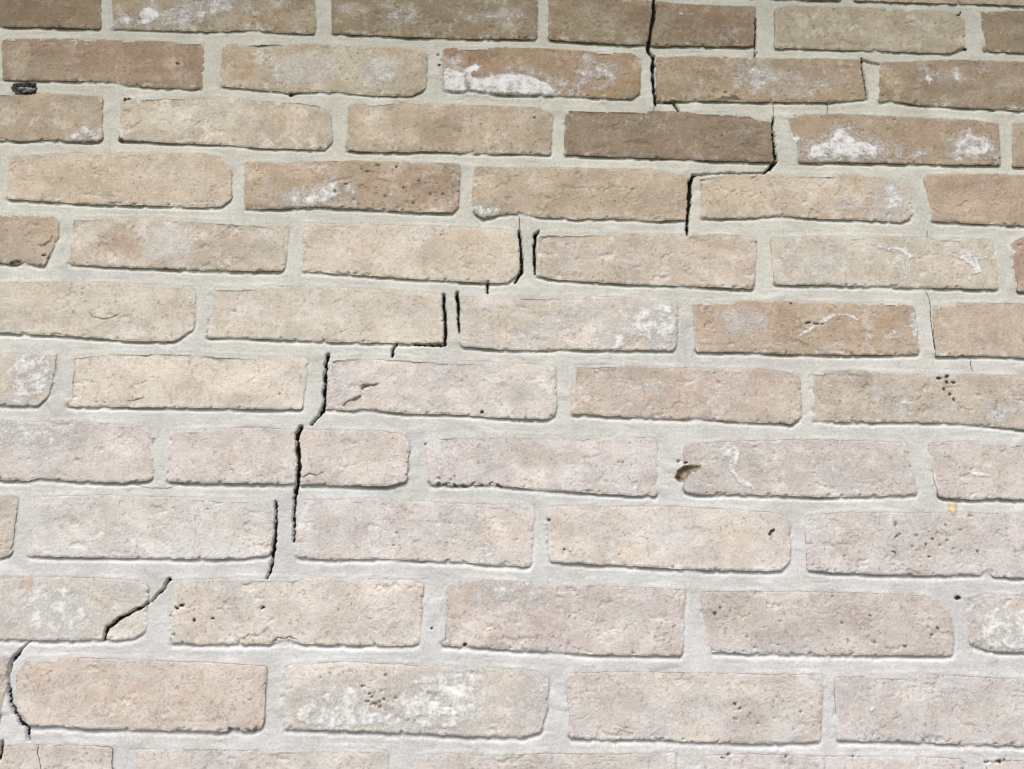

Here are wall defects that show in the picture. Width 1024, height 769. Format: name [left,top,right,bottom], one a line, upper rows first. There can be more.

crack [646,0,679,112]
crack [685,107,777,236]
crack [486,218,539,294]
crack [391,294,460,358]
crack [267,356,378,579]
crack [104,578,172,640]
crack [8,641,41,769]